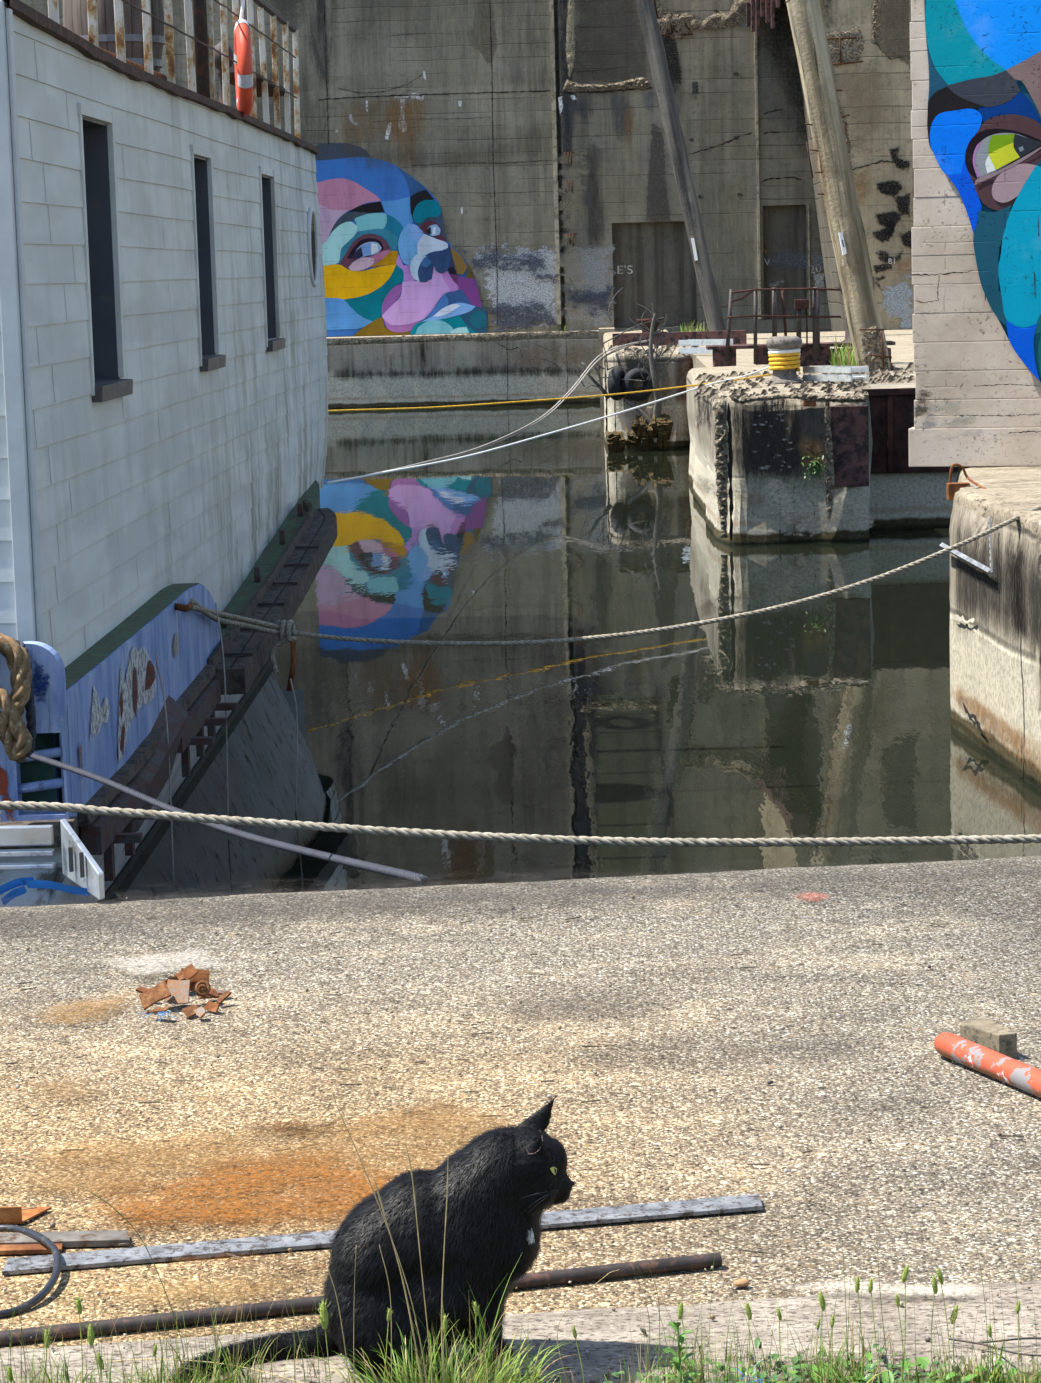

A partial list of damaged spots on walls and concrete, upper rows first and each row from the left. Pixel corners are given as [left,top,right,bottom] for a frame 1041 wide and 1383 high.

peeling [332,150,616,346]
damp [956,515,1041,705]